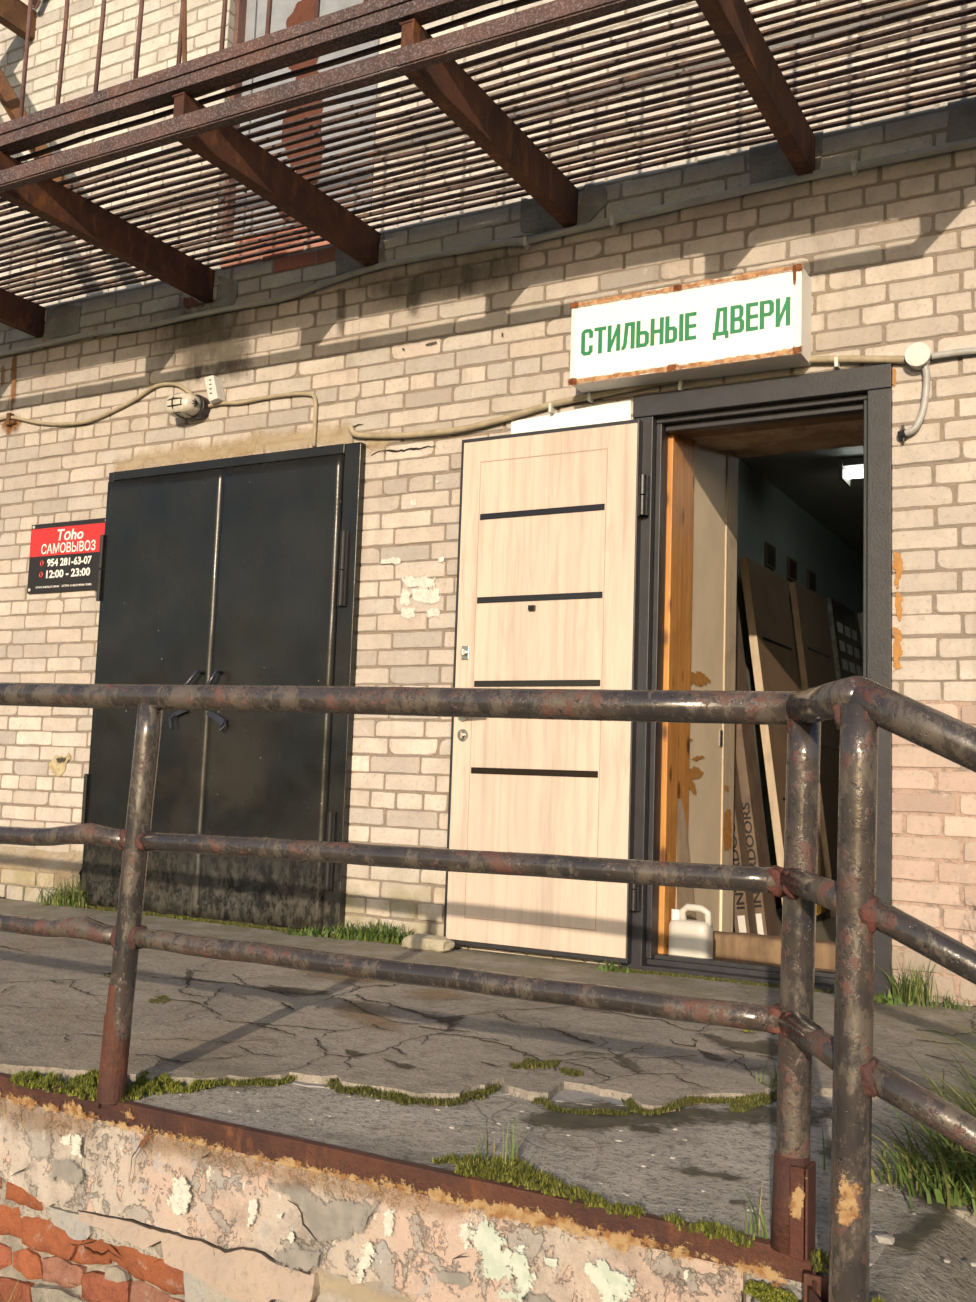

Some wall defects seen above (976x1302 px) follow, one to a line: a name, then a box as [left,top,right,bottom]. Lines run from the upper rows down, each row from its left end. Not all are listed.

rust [570,263,803,309]
rust [568,346,802,385]
peeling [691,671,711,686]
crack [0,945,107,1008]
crack [134,959,778,1088]
crack [915,998,976,1090]
spalling [48,1134,84,1187]
spalling [672,1167,747,1180]
spalling [0,1175,244,1302]
peeling [245,1198,258,1227]
peeling [434,1215,558,1302]
peeling [583,1258,637,1302]